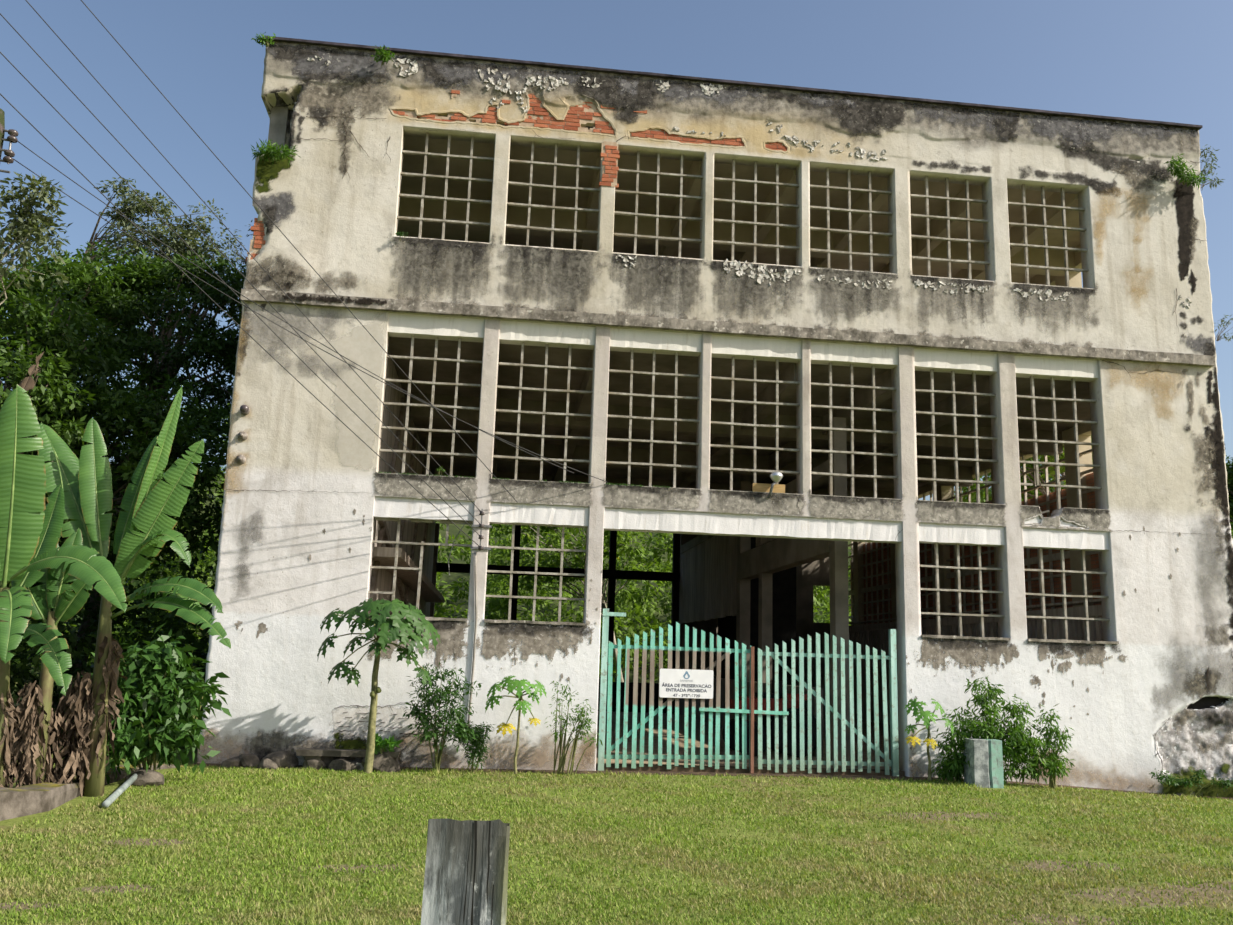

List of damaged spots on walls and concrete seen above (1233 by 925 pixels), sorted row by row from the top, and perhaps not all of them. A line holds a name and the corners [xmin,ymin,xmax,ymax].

flaking render [389,68,747,188]
leakage [262,42,1199,294]
peeling [763,121,888,161]
flaking render [246,218,266,262]
leakage [244,234,994,340]
leakage [1008,282,1098,344]
leakage [1180,312,1233,645]
leakage [238,516,262,588]
peeling [357,570,602,669]
leakage [1184,669,1220,698]
flaking render [1153,696,1233,798]